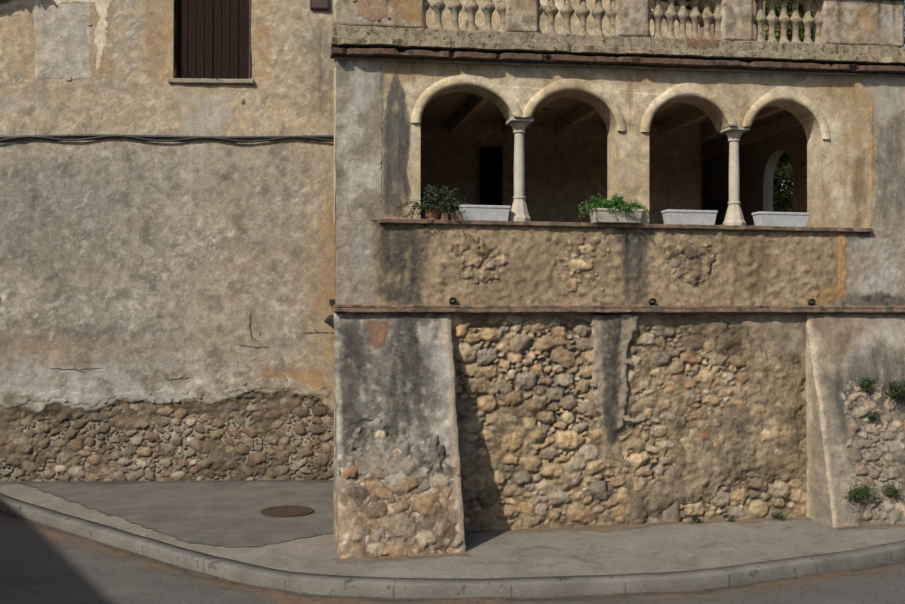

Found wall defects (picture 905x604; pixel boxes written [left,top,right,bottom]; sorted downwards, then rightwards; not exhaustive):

peeling [0,0,112,70]
leakage [349,60,376,111]
peeling [540,0,574,11]
leakage [359,74,428,303]
crack [240,314,261,349]
leakage [338,315,451,442]
spalling [0,312,808,559]
leakage [602,315,621,443]